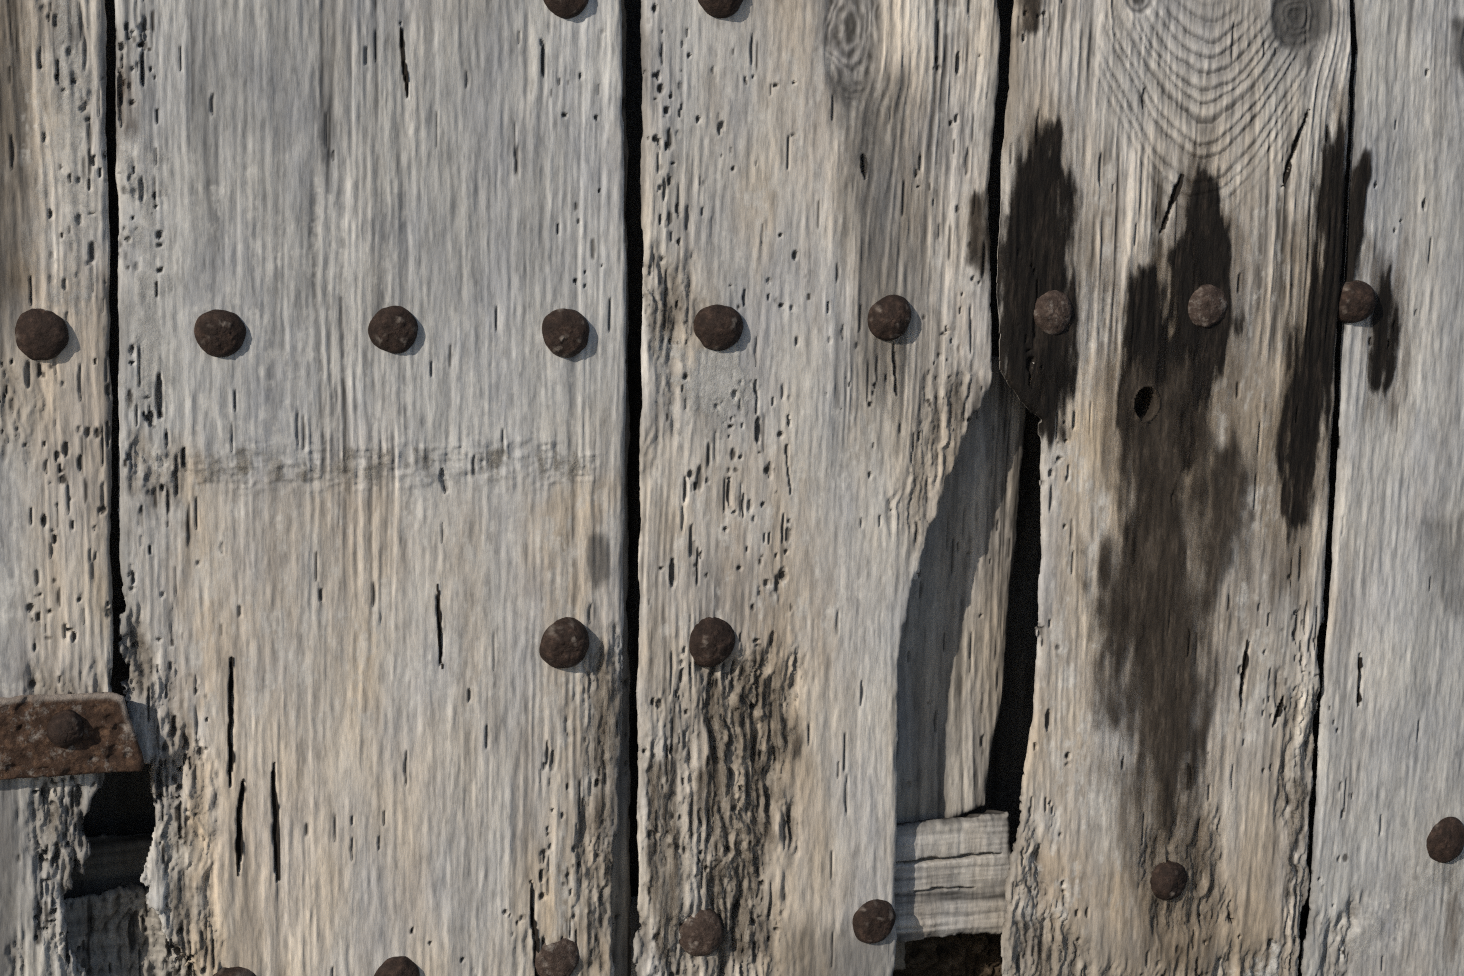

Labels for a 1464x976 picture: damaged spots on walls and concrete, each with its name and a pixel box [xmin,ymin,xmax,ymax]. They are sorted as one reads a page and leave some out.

crack [1282,109,1310,187]
damp [966,193,991,274]
damp [1344,148,1371,282]
damp [1028,367,1066,447]
damp [1079,230,1249,882]
crack [1356,657,1364,706]